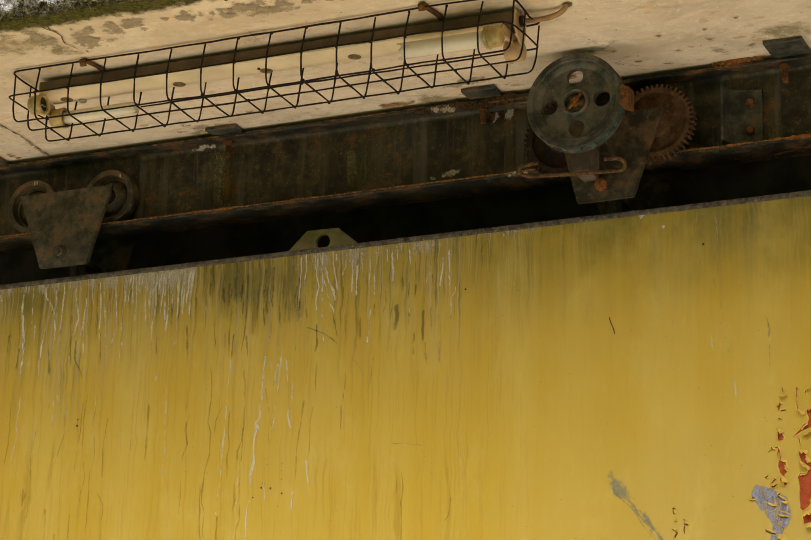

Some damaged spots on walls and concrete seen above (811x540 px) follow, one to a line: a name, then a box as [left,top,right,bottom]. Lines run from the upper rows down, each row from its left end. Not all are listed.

corrosion [692,55,766,71]
corrosion [305,93,528,125]
crack [0,125,51,158]
corrosion [676,134,811,153]
corrosion [101,169,537,225]
water stain [298,240,456,318]
water stain [20,267,195,374]
peeling [766,385,811,540]